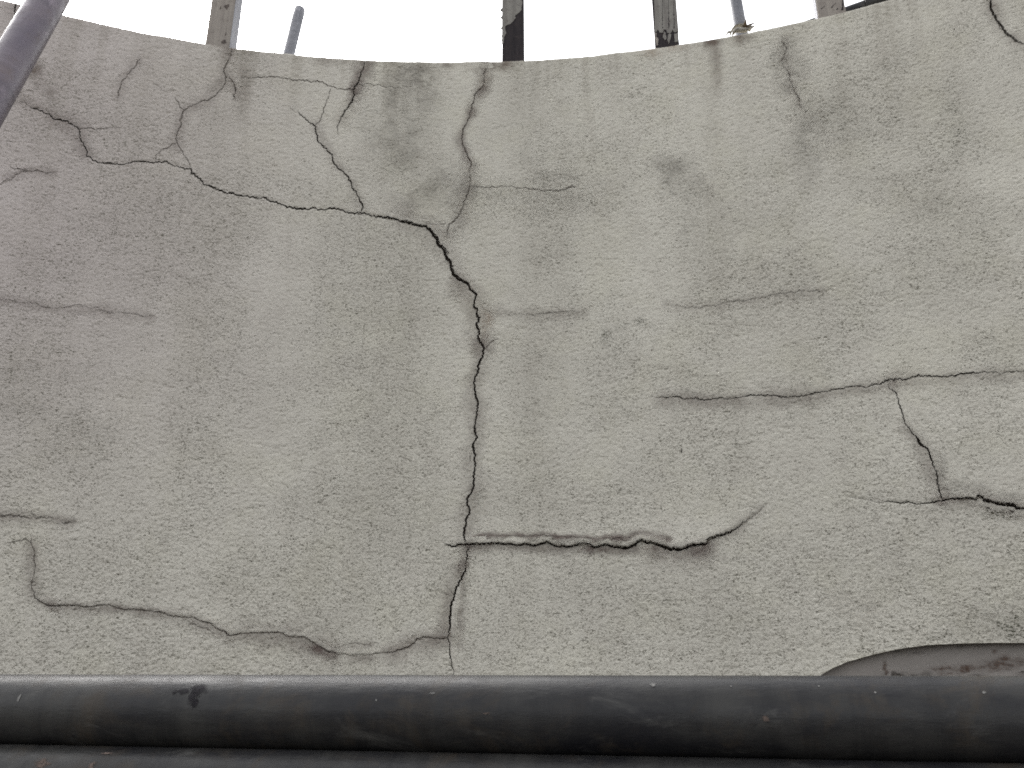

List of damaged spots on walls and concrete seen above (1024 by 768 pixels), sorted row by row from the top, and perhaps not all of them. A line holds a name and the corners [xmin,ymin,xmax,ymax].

crack [989,0,1024,44]
crack [1,51,756,675]
crack [657,370,1024,513]